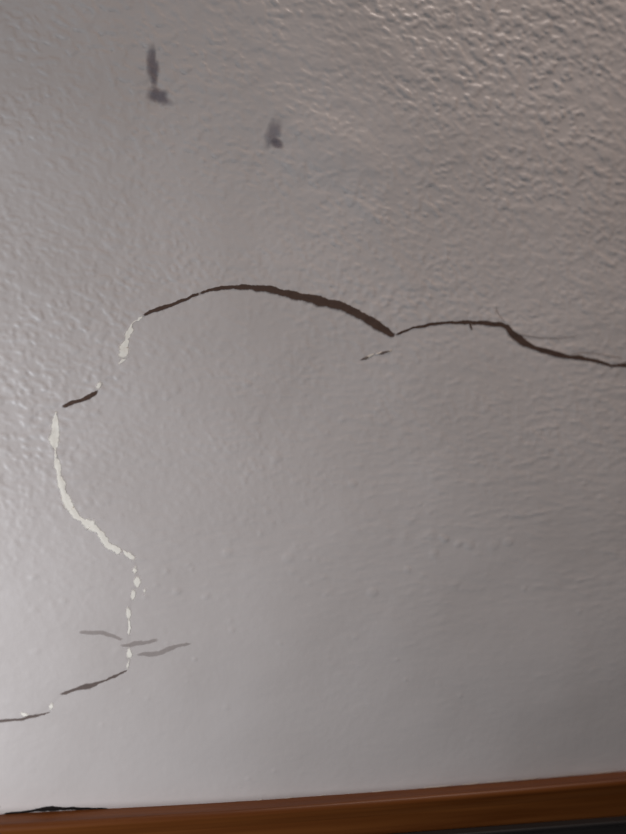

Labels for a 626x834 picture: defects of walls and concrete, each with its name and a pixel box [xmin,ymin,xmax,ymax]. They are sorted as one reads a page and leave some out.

crack [118,284,626,367]
crack [0,382,146,722]